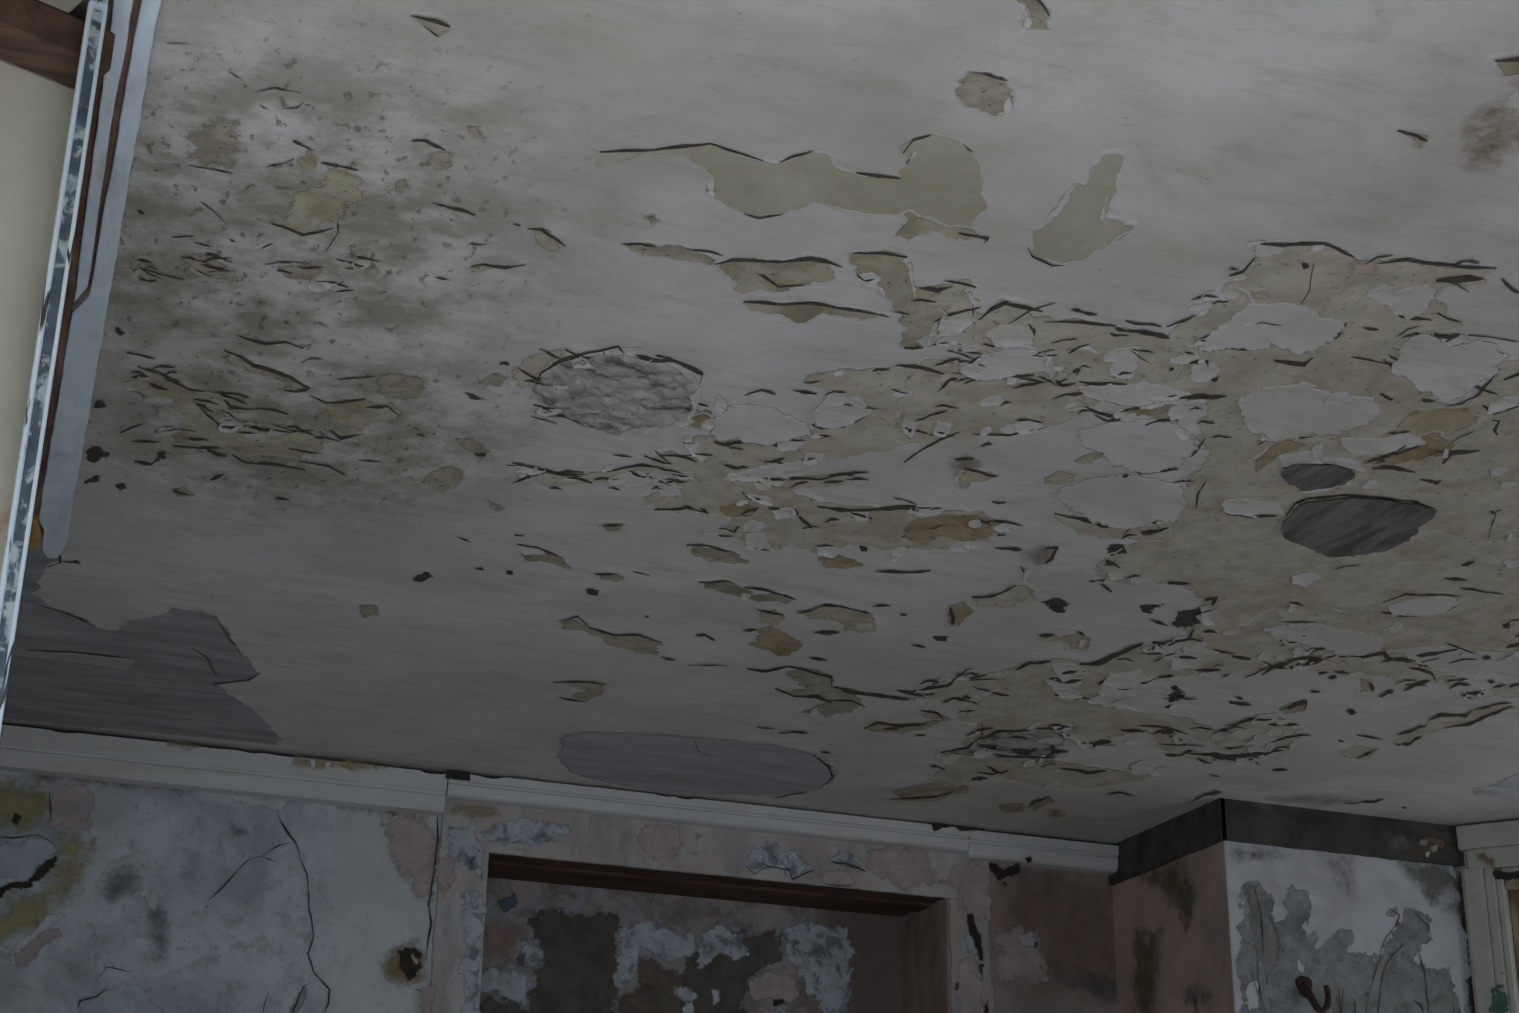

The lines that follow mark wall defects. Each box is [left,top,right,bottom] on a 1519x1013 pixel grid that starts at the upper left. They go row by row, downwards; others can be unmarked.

peeling [951,68,1023,120]
peeling [1008,0,1059,32]
peeling [1484,50,1519,79]
flaking render [0,193,286,746]
peeling [462,133,1519,817]
flaking render [445,770,470,781]
peeling [0,813,57,898]
crack [208,811,331,1013]
peeling [434,806,856,1013]
peeling [743,843,1032,1013]
flaking render [1236,880,1461,1013]
peeling [1489,961,1519,1013]